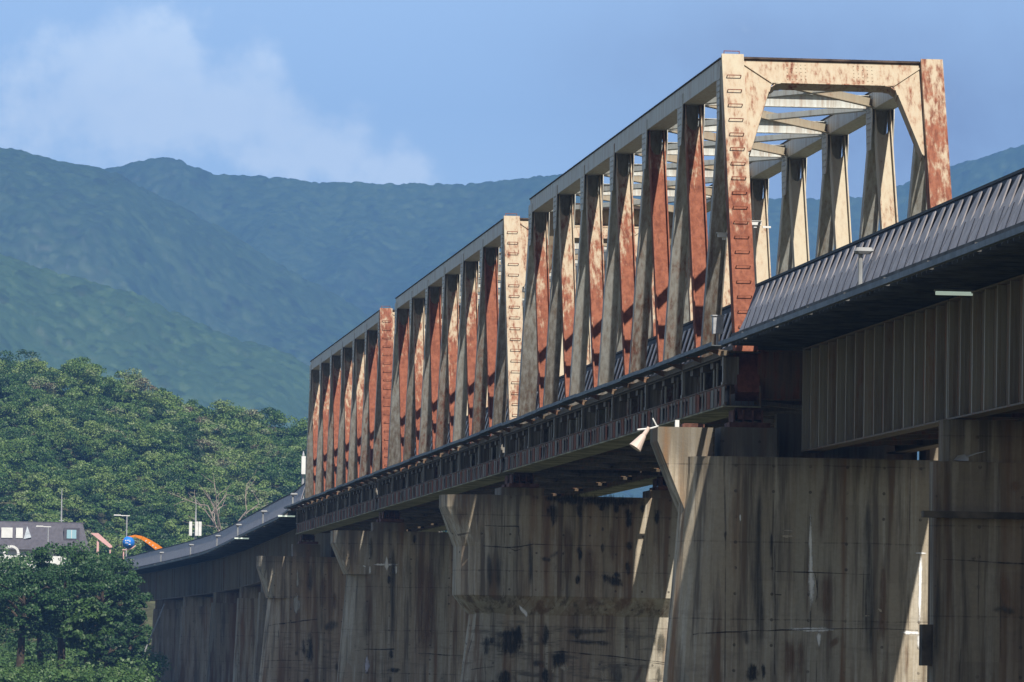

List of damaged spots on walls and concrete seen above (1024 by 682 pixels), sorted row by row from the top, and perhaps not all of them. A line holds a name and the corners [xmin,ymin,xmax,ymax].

leakage [546,494,659,528]
leakage [754,500,773,636]
leakage [916,552,926,615]
leakage [484,606,549,655]